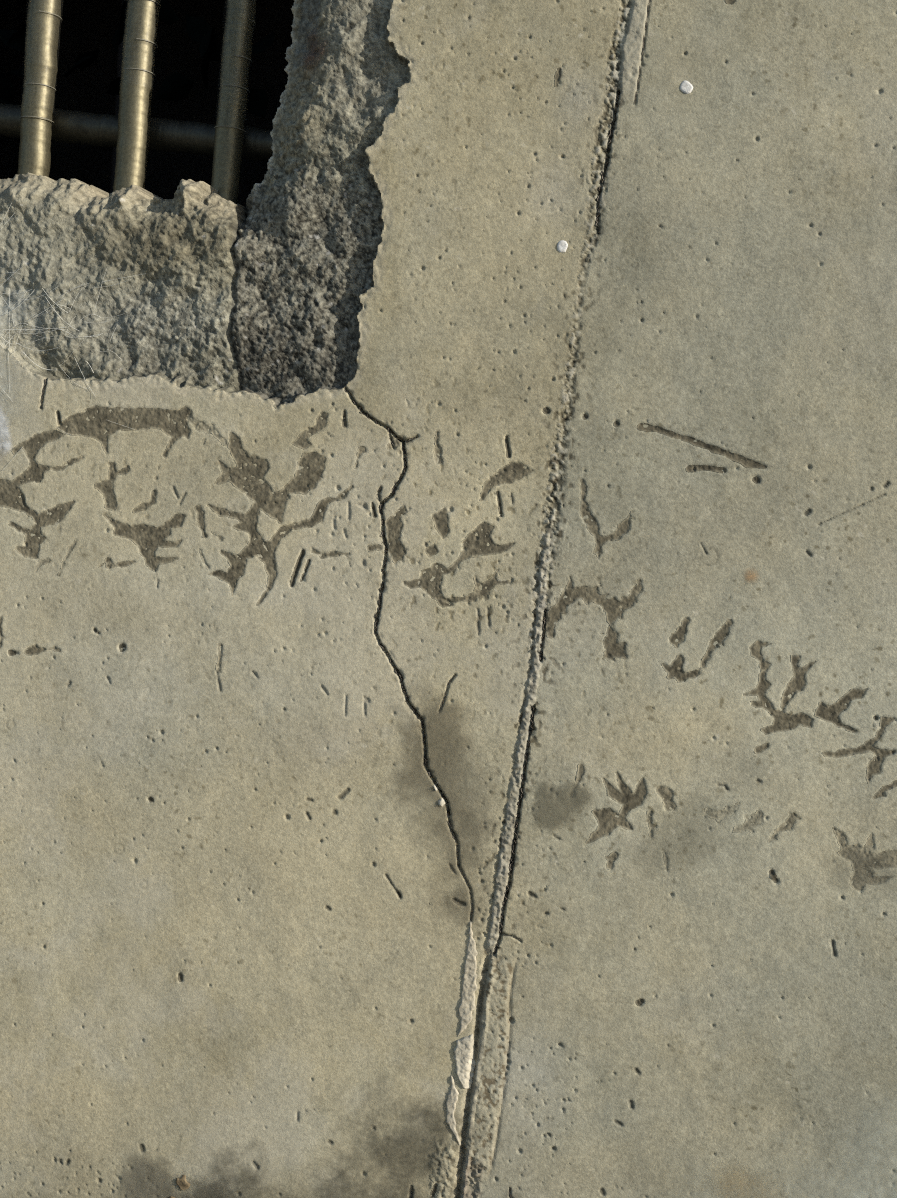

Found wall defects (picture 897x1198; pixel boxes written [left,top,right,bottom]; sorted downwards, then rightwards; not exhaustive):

spalling [0,0,411,407]
crack [596,0,650,231]
crack [345,389,536,954]
crack [538,611,546,661]
water stain [538,784,589,827]
water stain [125,1159,257,1198]